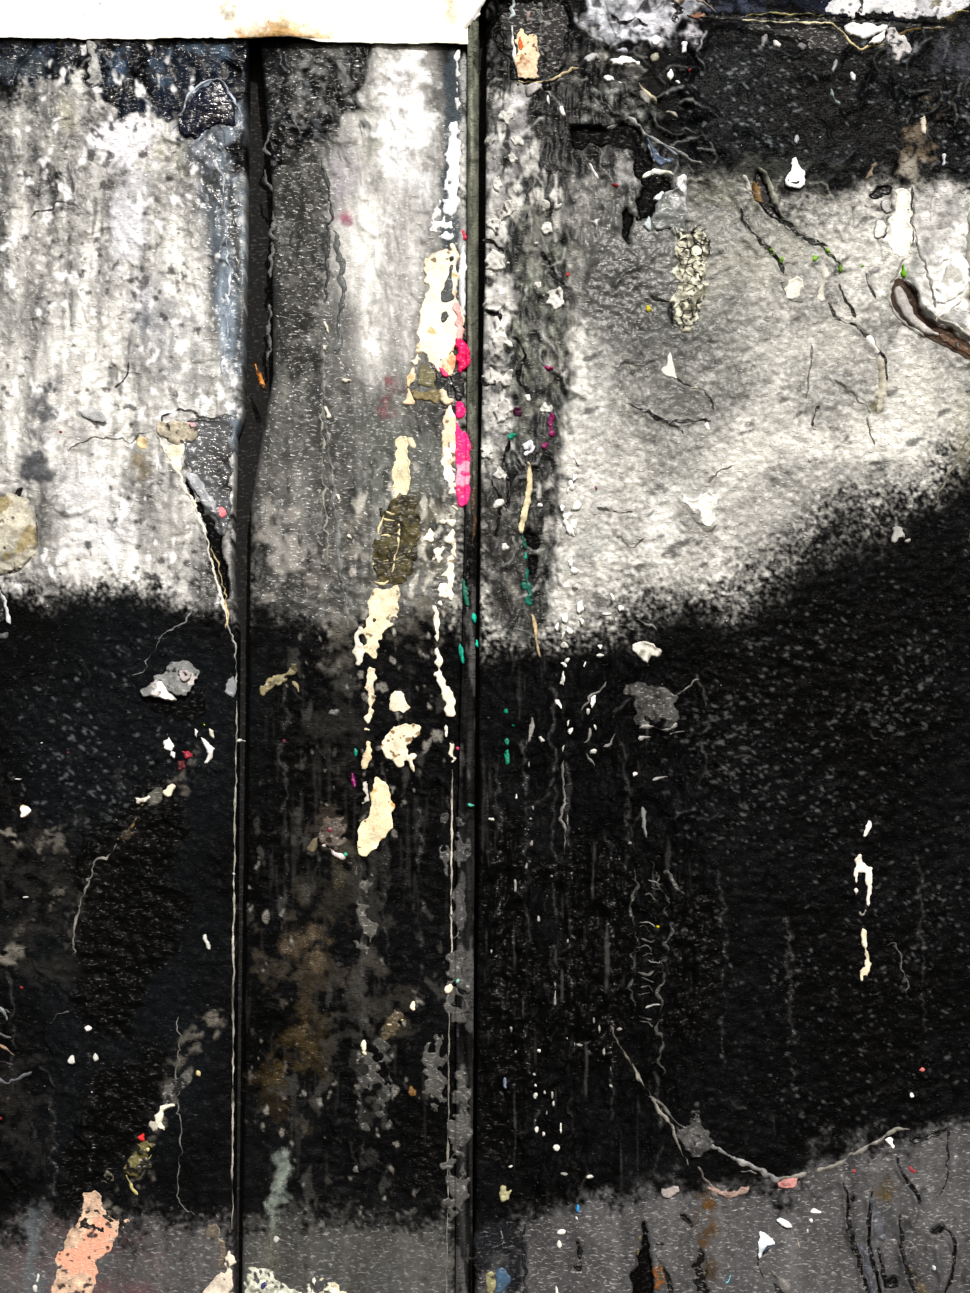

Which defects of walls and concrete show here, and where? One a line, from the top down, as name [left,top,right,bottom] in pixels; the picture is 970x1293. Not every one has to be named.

rust [236,23,329,39]
peeling [825,0,970,20]
peeling [392,436,416,498]
peeling [51,1170,130,1293]